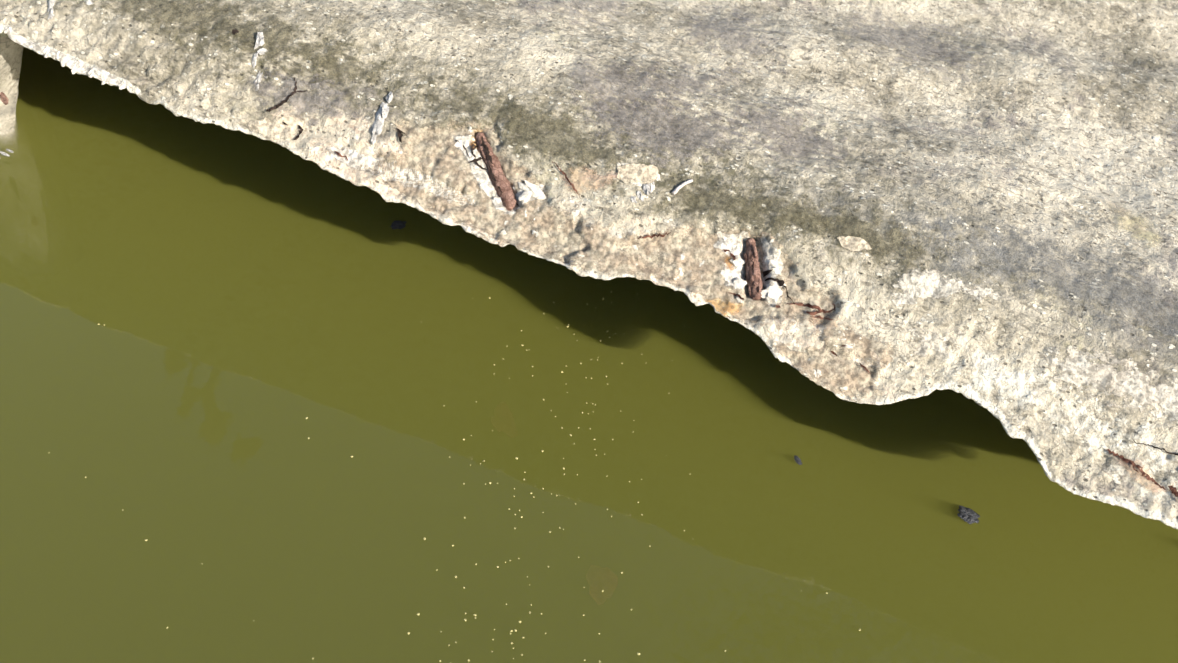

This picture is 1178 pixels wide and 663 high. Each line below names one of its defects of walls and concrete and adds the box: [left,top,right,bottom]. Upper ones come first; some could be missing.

spalling [0,25,133,93]
spalling [247,114,305,140]
spalling [318,118,898,402]
spalling [892,269,1001,306]
spalling [909,324,961,359]